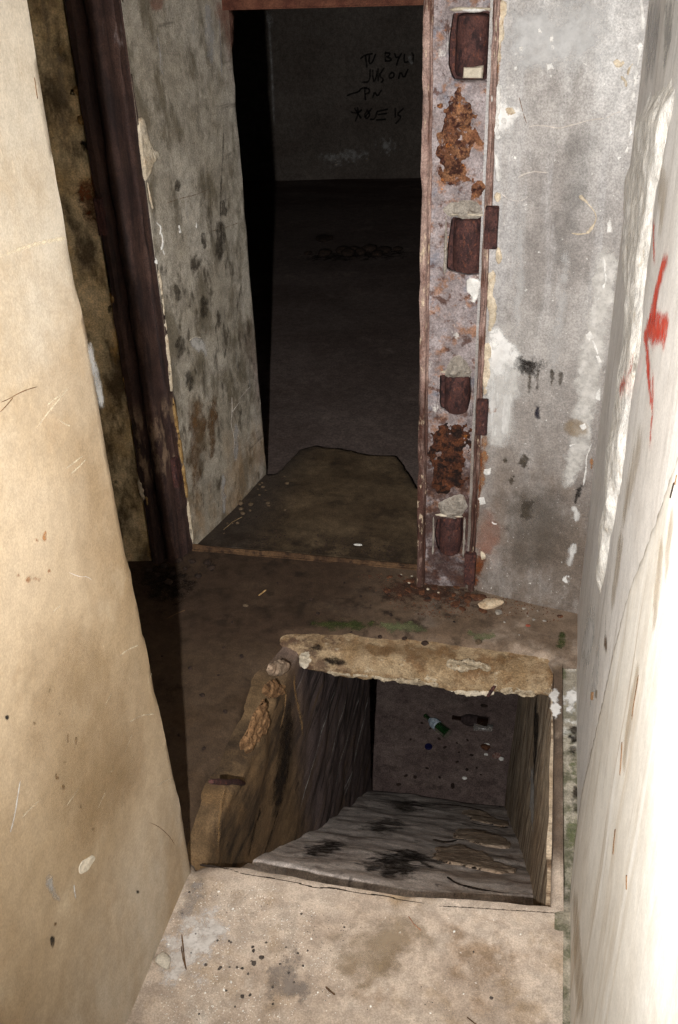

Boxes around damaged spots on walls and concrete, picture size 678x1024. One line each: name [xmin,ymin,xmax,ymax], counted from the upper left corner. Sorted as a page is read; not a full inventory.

flaking render [137,117,160,209]
rust [435,87,485,200]
damp [190,179,227,274]
damp [200,296,220,327]
rust [427,423,488,517]